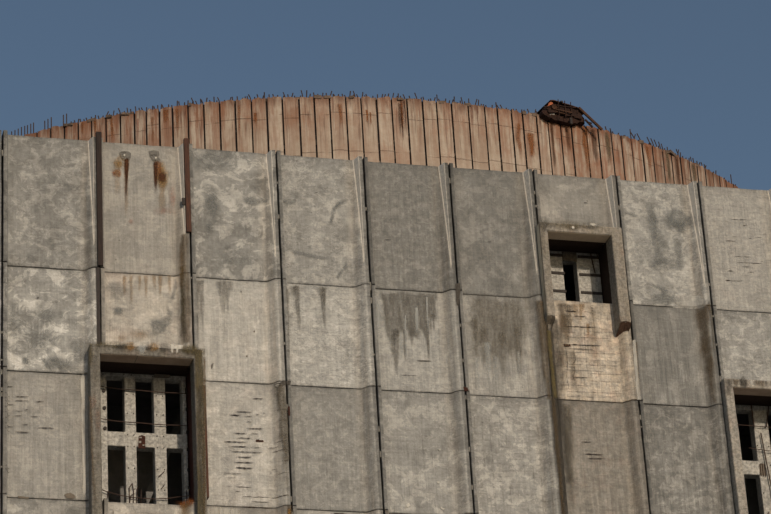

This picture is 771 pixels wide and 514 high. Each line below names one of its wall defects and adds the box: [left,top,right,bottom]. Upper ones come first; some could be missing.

corrosion [113,158,129,191]
corrosion [154,162,167,187]
damp [377,293,435,360]